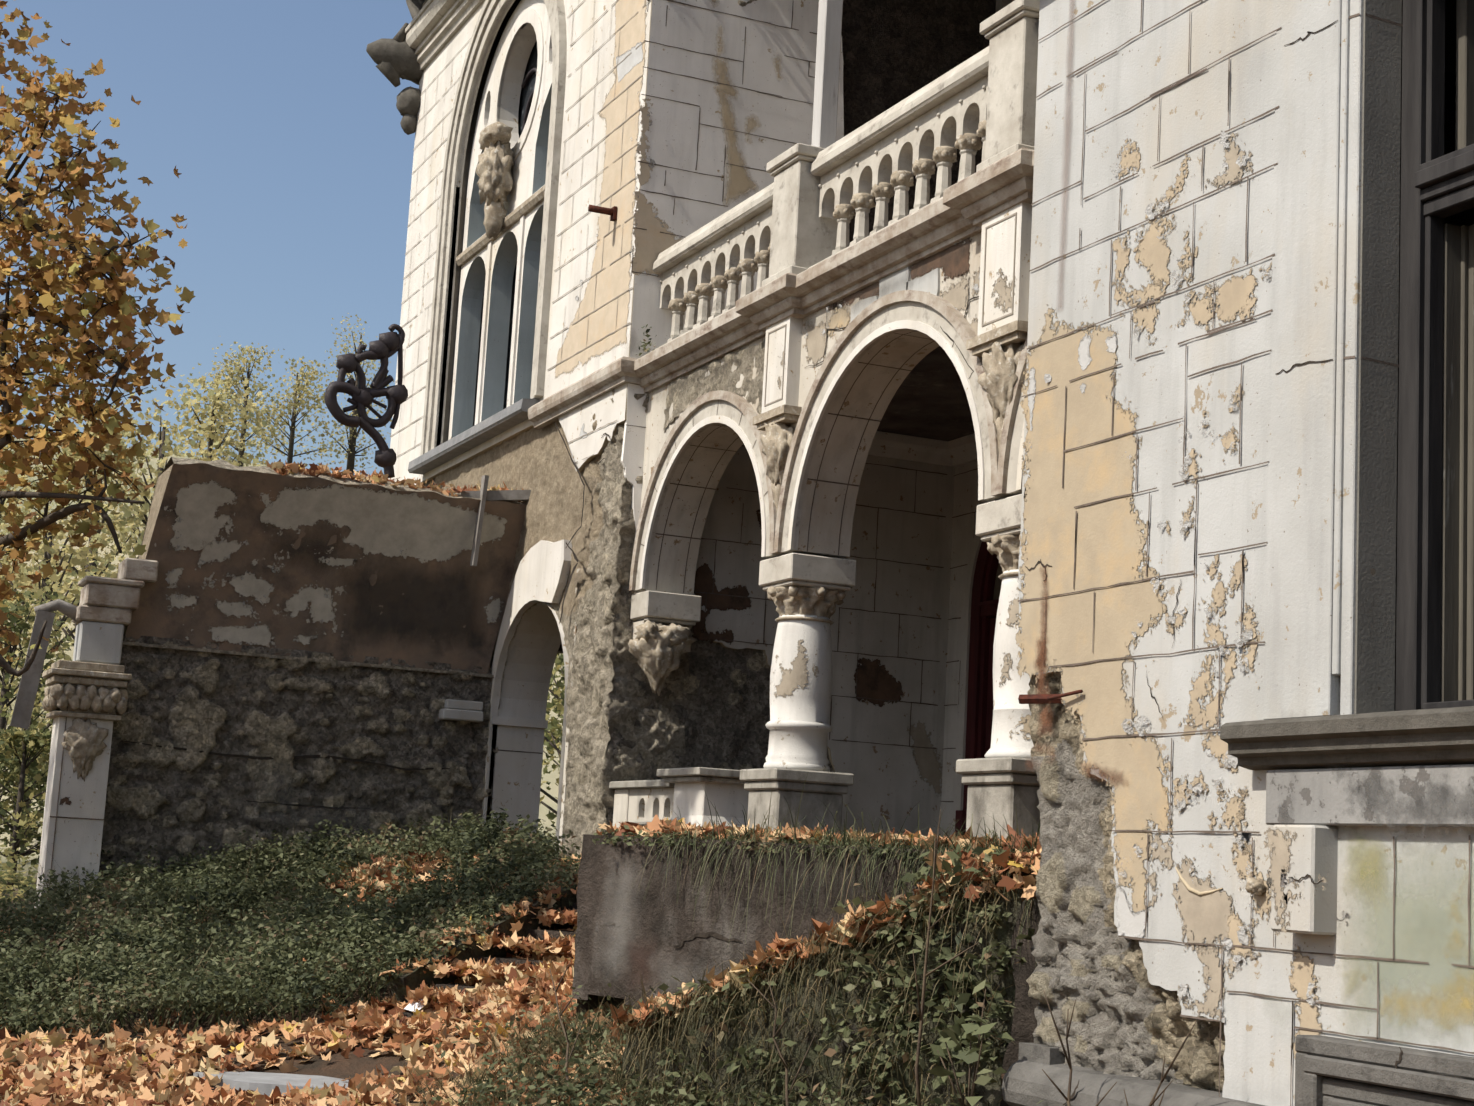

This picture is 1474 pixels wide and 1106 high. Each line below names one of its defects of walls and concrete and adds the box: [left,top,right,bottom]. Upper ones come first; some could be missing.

spalling [841,0,996,136]
crack [1284,20,1338,46]
peeling [555,0,682,378]
spalling [849,137,983,245]
crack [1276,359,1333,374]
peeling [154,480,507,649]
water stain [355,575,475,639]
peeling [773,640,819,698]
rust [1036,572,1051,749]
peeling [999,131,1328,1093]
water stain [1352,776,1474,823]
crack [1288,874,1324,885]